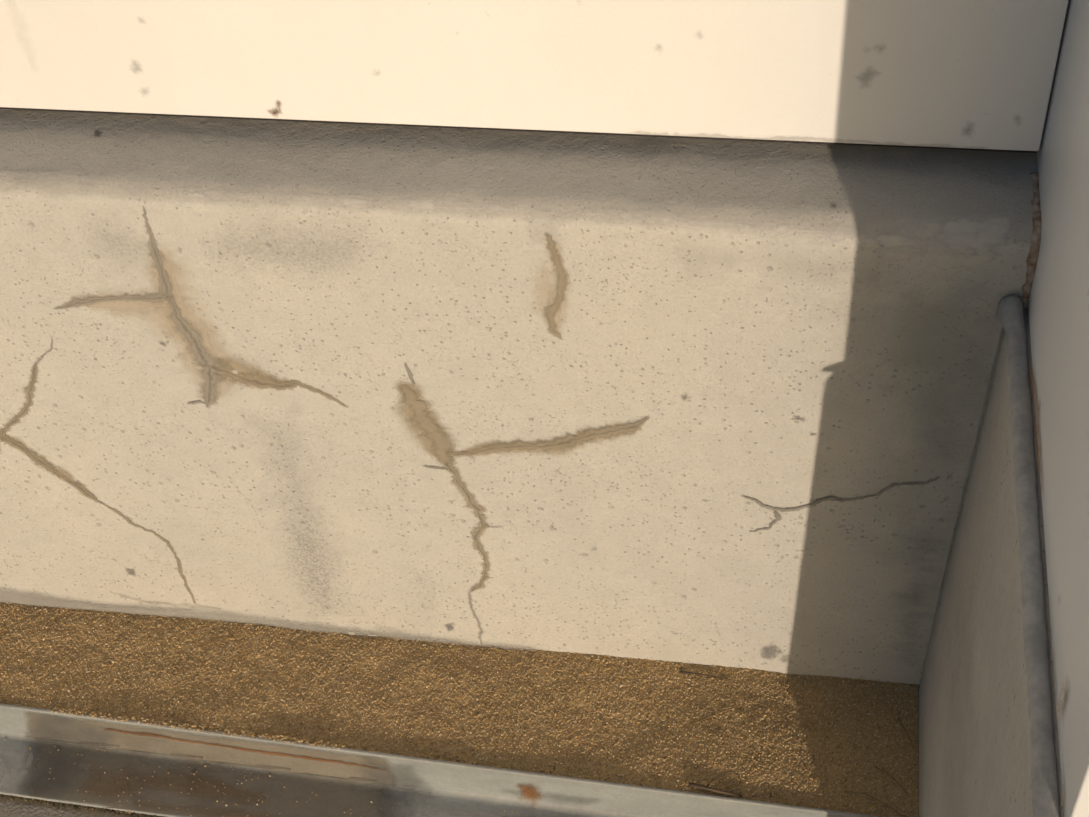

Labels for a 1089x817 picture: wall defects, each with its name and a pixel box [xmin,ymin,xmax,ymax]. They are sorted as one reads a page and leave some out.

crack [55,208,347,407]
crack [546,235,567,339]
crack [0,364,195,604]
crack [400,364,649,592]
crack [742,477,939,532]